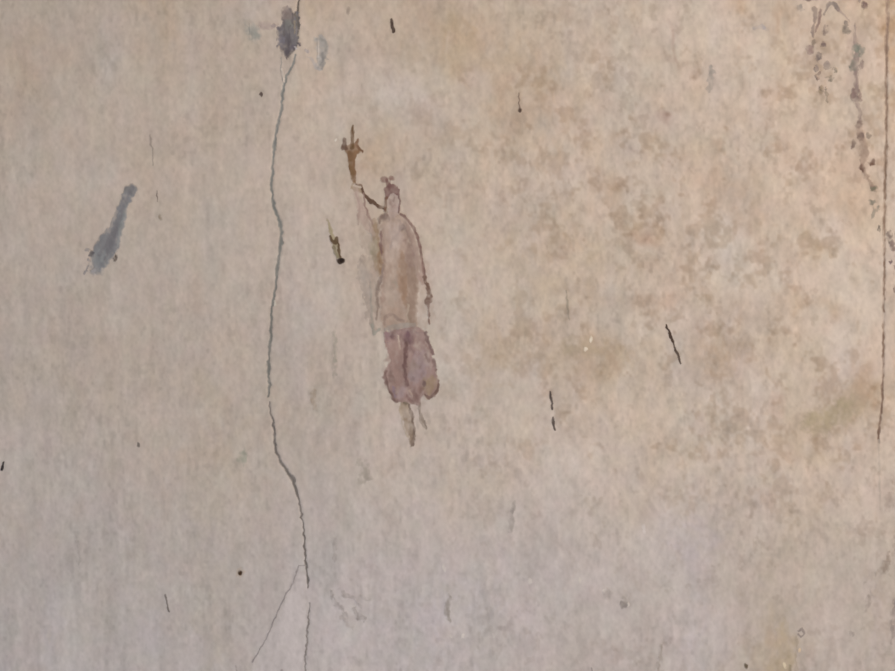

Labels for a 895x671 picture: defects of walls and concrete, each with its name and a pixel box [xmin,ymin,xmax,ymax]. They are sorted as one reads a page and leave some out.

water stain [306,34,329,71]
water stain [83,183,138,276]
crack [252,54,311,671]